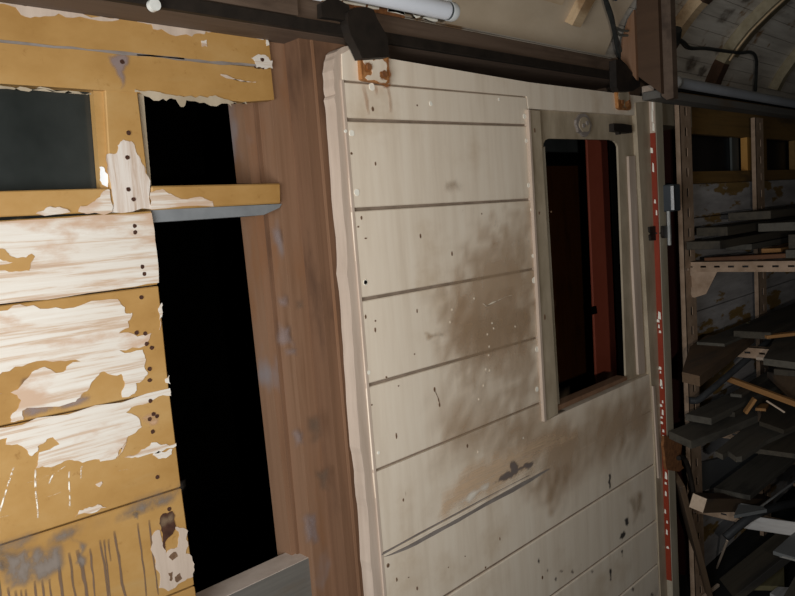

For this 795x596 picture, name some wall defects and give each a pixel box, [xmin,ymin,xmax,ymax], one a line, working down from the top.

peeling [0,2,119,21]
peeling [340,0,438,22]
peeling [140,22,209,47]
peeling [252,38,273,69]
peeling [0,85,91,95]
peeling [135,90,247,107]
peeling [0,140,214,468]
crack [382,469,549,557]
peeling [151,511,194,591]